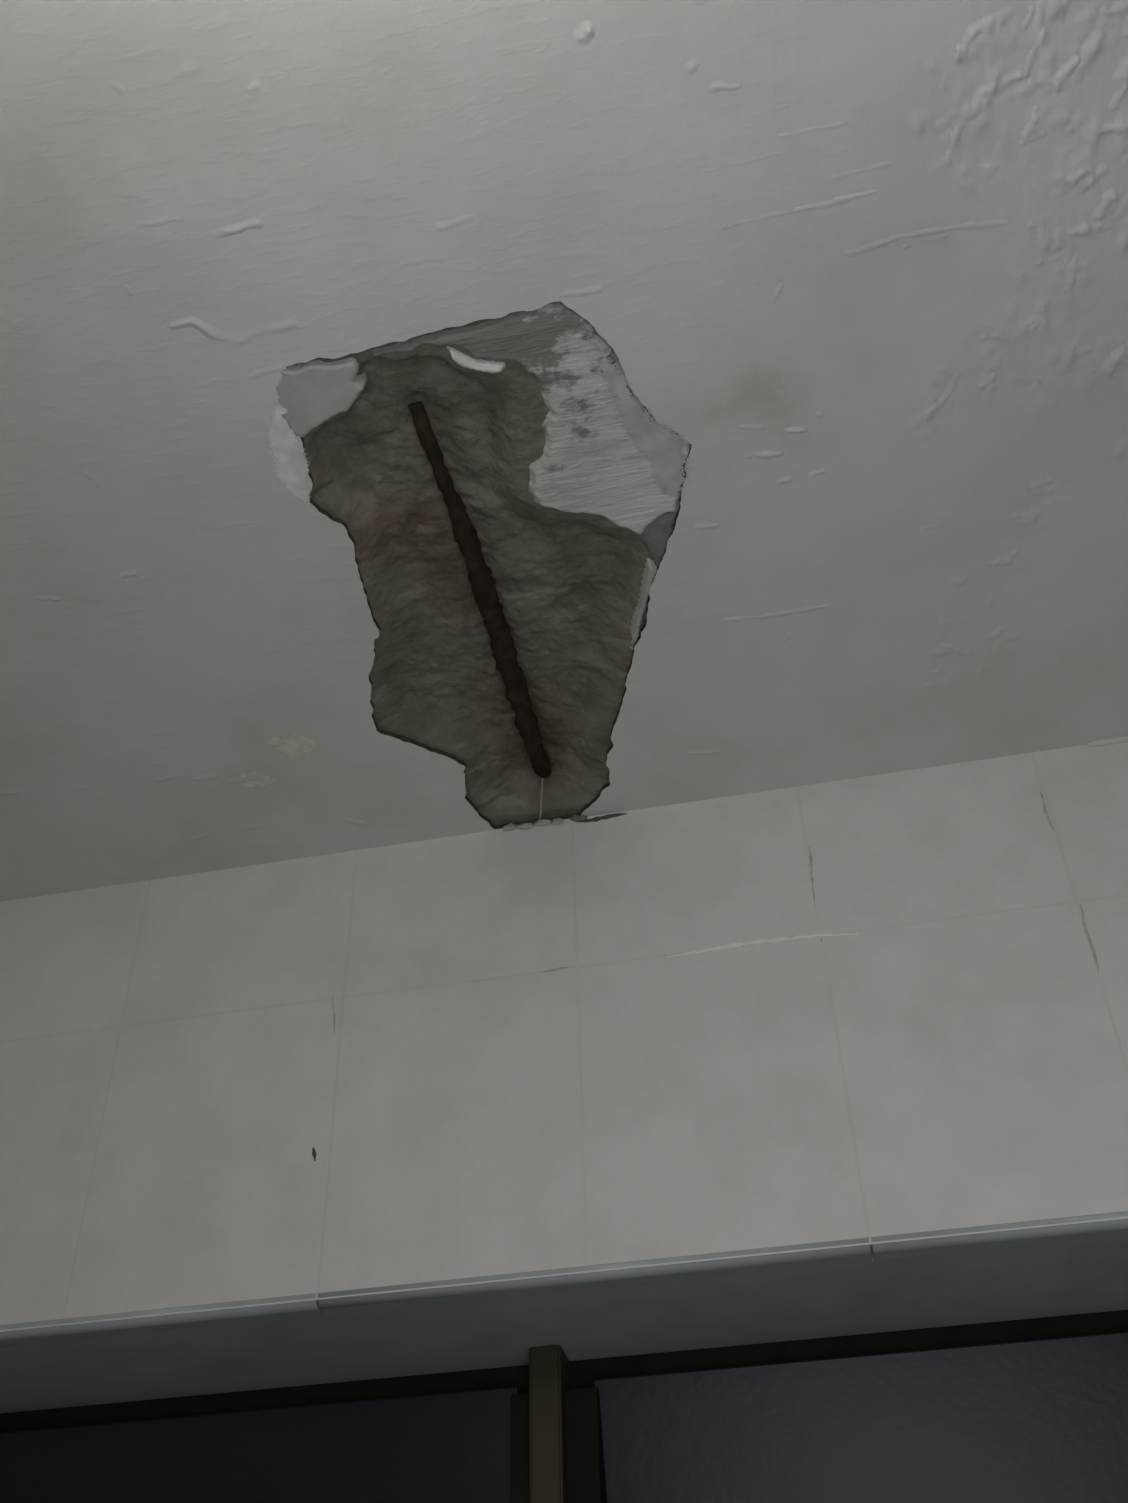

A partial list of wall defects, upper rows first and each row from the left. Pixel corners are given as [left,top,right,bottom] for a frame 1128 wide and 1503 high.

spalling [265,301,692,831]